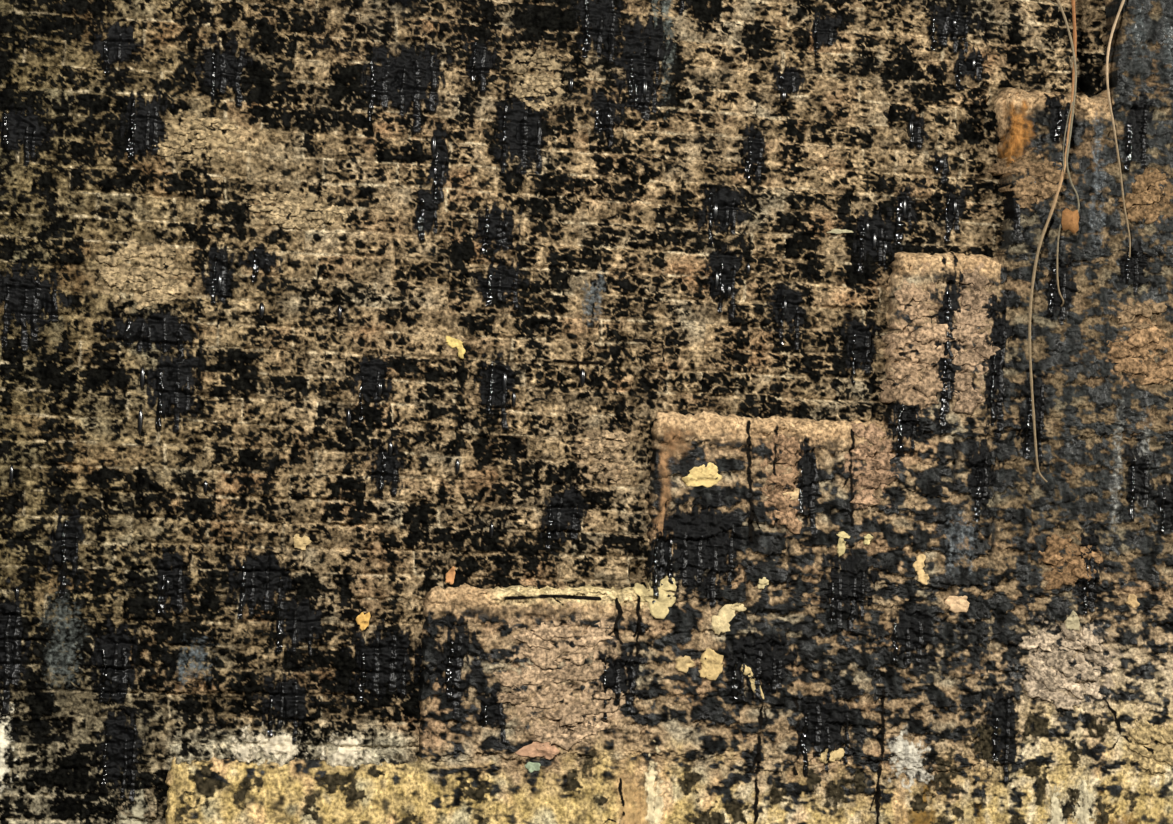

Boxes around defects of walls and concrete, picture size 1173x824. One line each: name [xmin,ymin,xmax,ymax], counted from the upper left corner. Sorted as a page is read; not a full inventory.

spalling [879,263,1000,415]
flaking render [682,462,722,488]
spalling [759,434,805,536]
spalling [843,421,899,509]
water stain [652,525,735,608]
flaking render [836,531,850,557]
spalling [493,601,630,773]